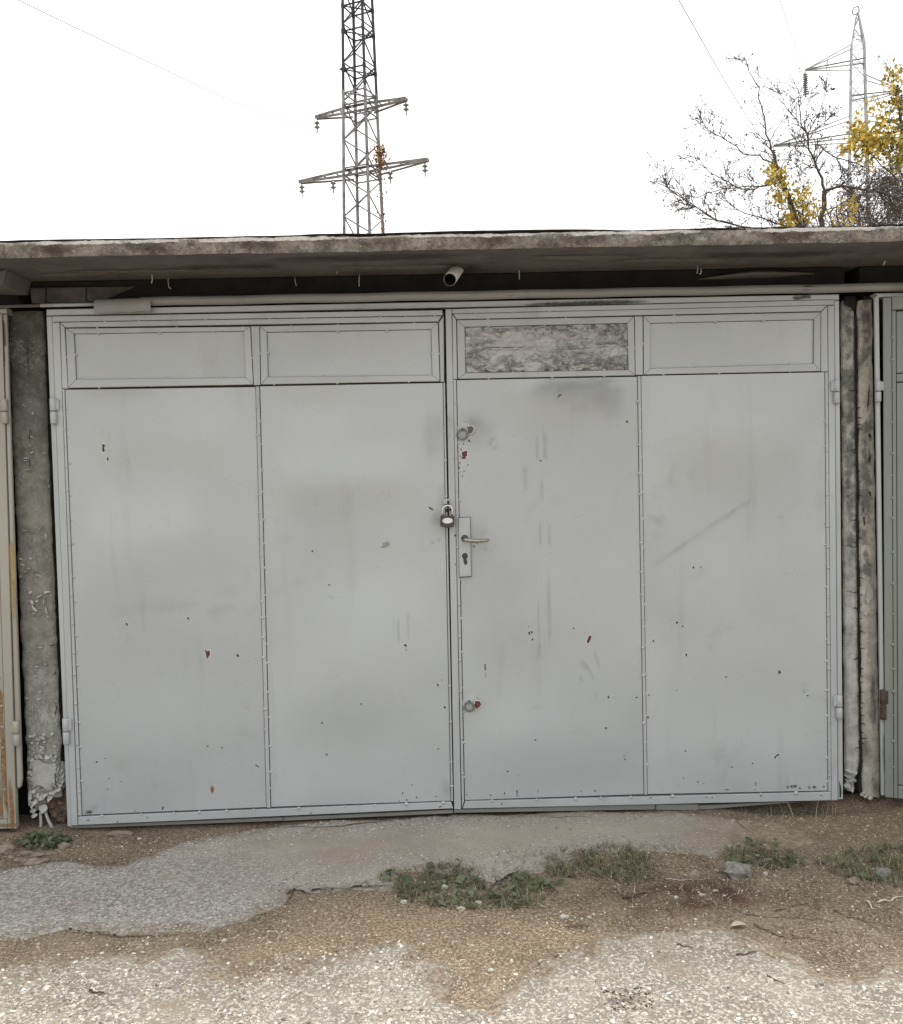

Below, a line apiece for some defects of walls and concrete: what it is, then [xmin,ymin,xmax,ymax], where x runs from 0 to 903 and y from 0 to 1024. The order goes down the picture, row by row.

spalling [25,663,67,828]